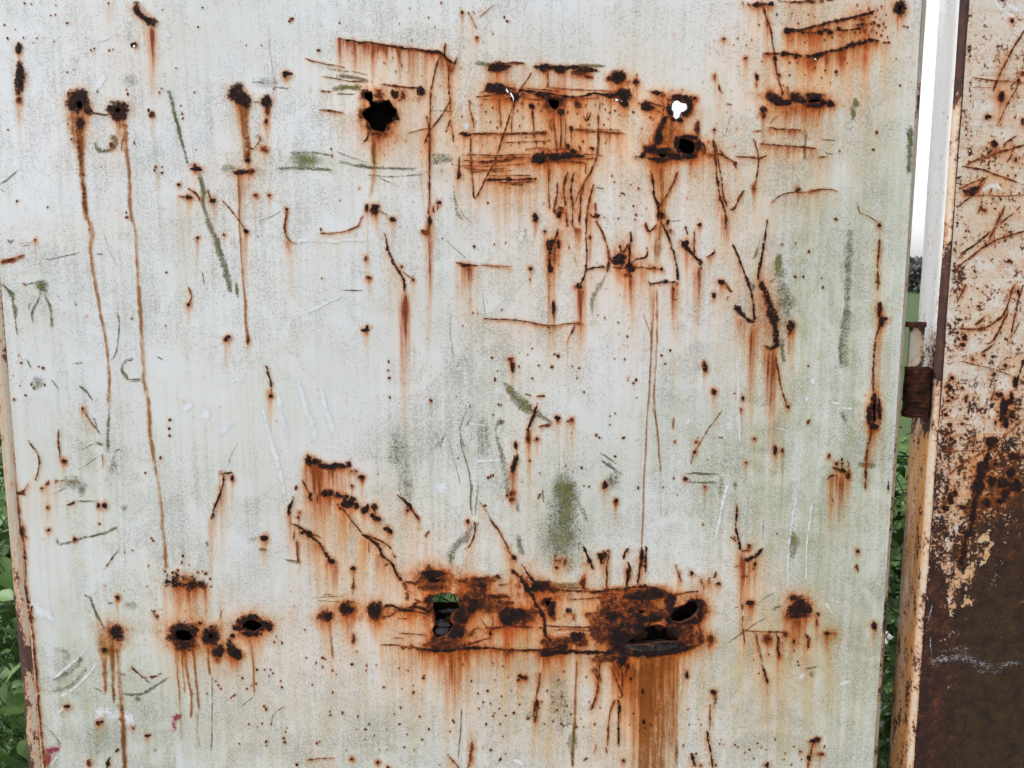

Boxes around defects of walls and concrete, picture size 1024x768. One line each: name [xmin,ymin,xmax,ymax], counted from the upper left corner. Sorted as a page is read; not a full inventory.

corrosion [742,0,834,43]
corrosion [476,61,669,146]
corrosion [529,139,586,166]
corrosion [227,81,274,344]
corrosion [609,205,663,290]
corrosion [304,455,393,534]
corrosion [941,359,1024,568]
corrosion [210,638,242,661]
corrosion [453,574,537,629]
corrosion [529,579,714,768]
corrosion [782,594,837,666]
peeling [948,532,994,609]